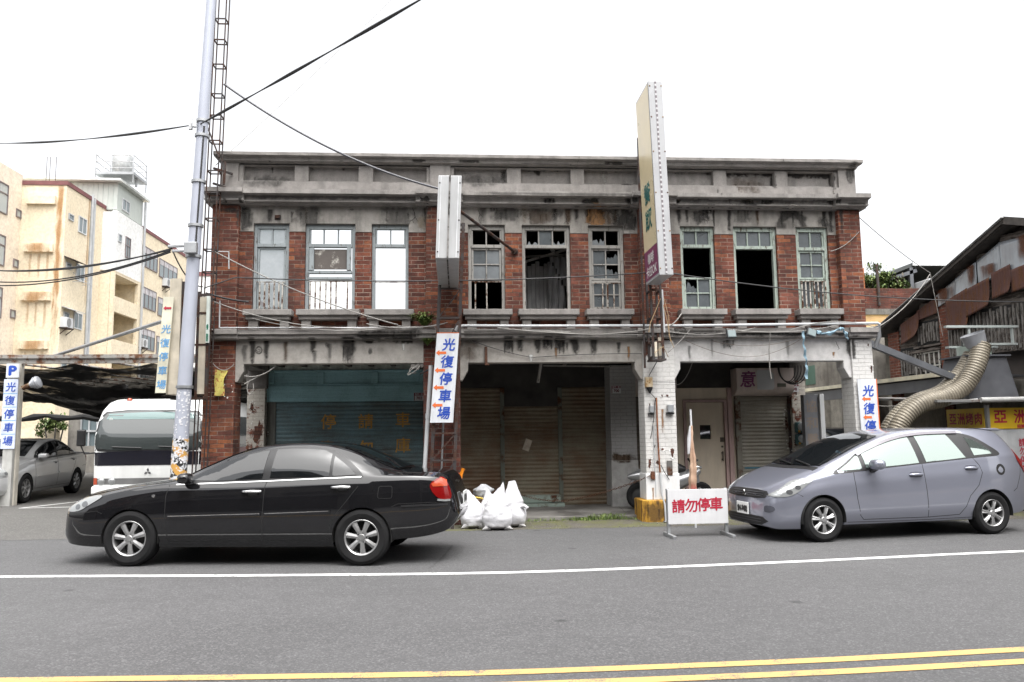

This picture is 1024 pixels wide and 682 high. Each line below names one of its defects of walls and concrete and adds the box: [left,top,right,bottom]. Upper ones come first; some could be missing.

leakage [480,205,526,220]
leakage [575,184,642,230]
leakage [676,199,731,230]
leakage [726,161,865,232]
corrosion [52,189,63,307]
corrosion [967,263,993,284]
leakage [242,337,269,364]
leakage [504,336,597,361]
peeling [248,401,269,443]